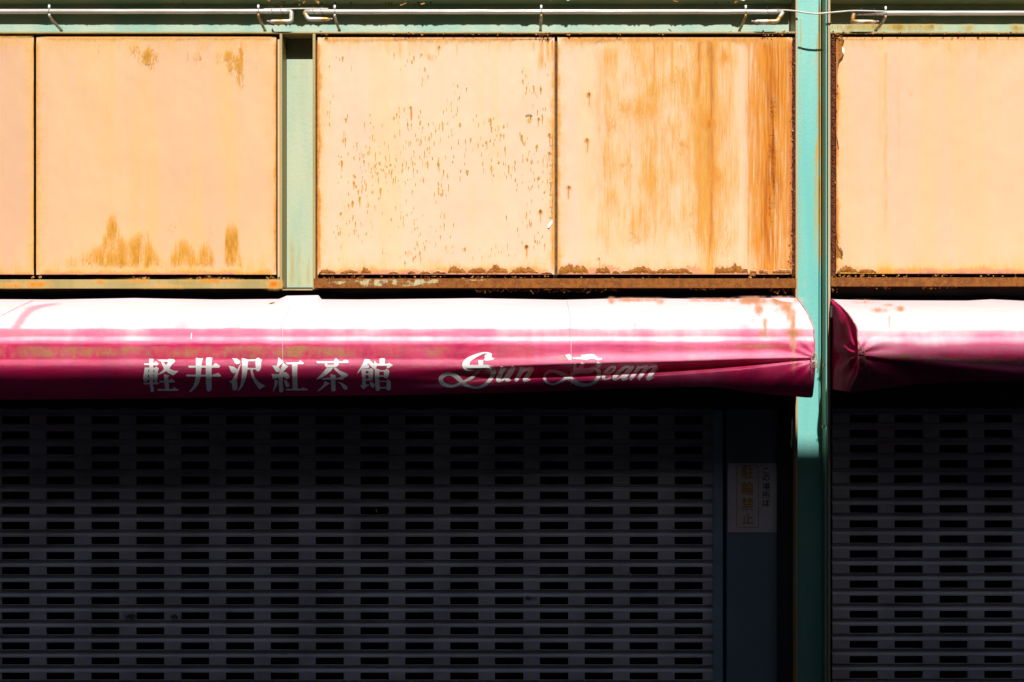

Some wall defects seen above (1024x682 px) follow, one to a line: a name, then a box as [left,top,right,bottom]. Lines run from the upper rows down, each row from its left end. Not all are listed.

corrosion [0,195,279,288]
corrosion [48,37,276,177]
corrosion [318,37,796,277]
corrosion [816,7,1024,276]